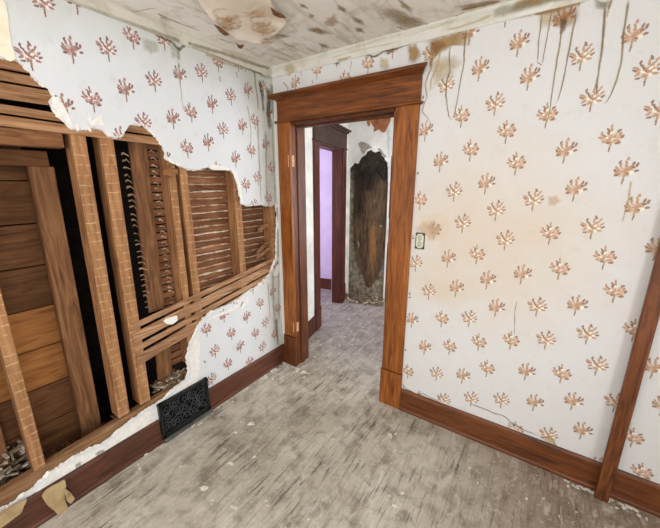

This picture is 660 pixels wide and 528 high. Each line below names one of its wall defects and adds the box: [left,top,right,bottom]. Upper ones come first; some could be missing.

leakage [254,74,274,166]
leakage [367,45,419,66]
leakage [425,32,466,116]
leakage [535,3,580,66]
leakage [596,2,609,93]
leakage [608,4,629,99]
spalling [0,97,138,424]
spalling [113,140,177,329]
spalling [348,118,391,301]
spalling [145,356,161,397]
flaking render [169,334,200,398]
flaking render [36,406,159,516]